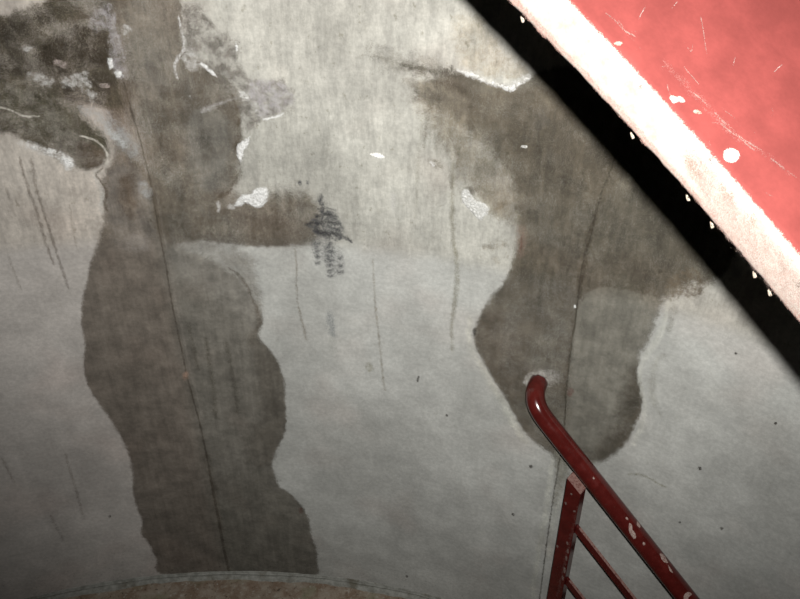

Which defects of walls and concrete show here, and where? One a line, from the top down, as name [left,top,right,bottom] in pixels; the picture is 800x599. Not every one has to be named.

crack [105,0,230,571]
damp [16,0,331,575]
peeling [216,187,268,211]
peeling [236,136,251,178]
flaking render [461,177,519,221]
damp [406,5,737,465]